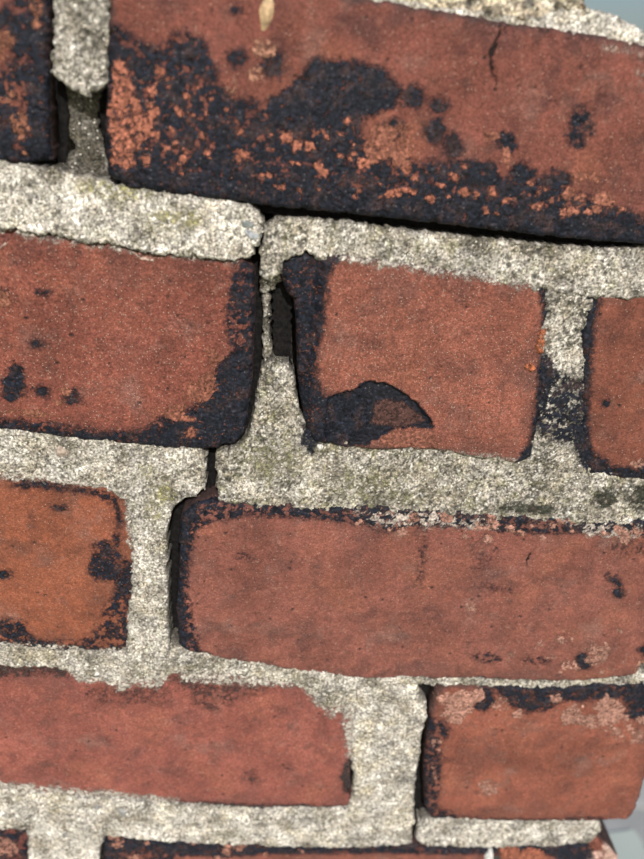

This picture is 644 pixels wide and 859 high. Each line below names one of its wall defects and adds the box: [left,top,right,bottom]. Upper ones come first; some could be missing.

crack [489,24,553,85]
crack [245,204,633,430]
crack [169,447,217,629]
crack [419,683,431,704]
peeling [546,641,613,674]
crack [412,730,426,832]